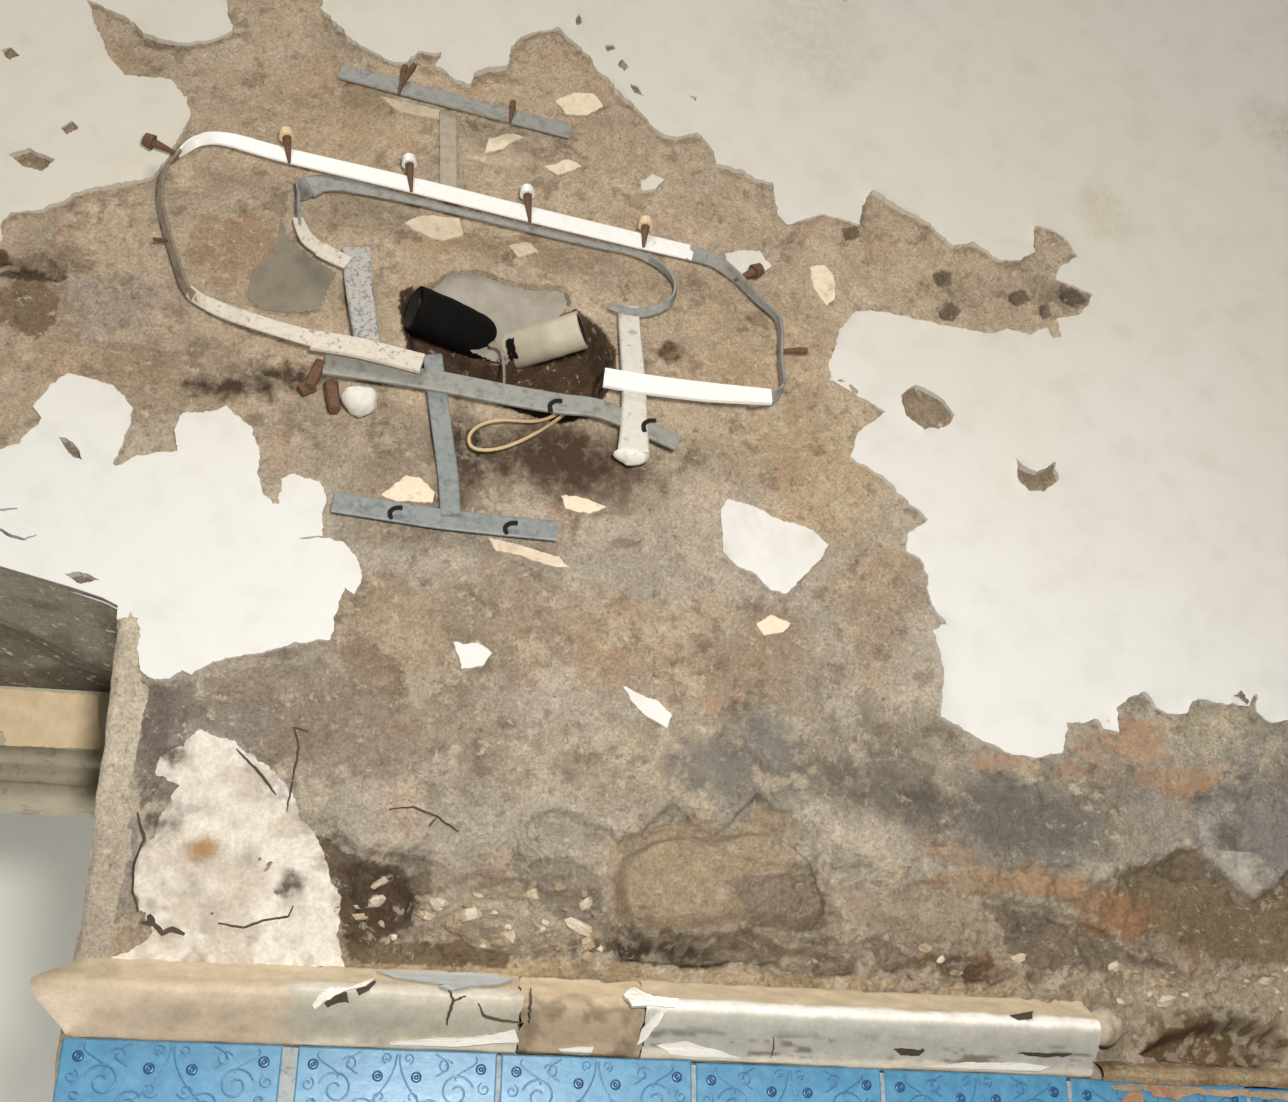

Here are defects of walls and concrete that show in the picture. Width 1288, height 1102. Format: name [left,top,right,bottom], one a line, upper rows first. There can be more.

flaking render [89,0,441,183]
flaking render [164,145,780,407]
flaking render [901,388,953,430]
flaking render [561,495,606,515]
flaking render [720,499,829,595]
flaking render [623,686,672,729]
crack [236,727,308,812]
crack [131,812,185,936]
peeling [111,729,345,967]
crack [218,906,294,929]
spalling [329,790,1288,1079]
crack [446,988,532,1025]